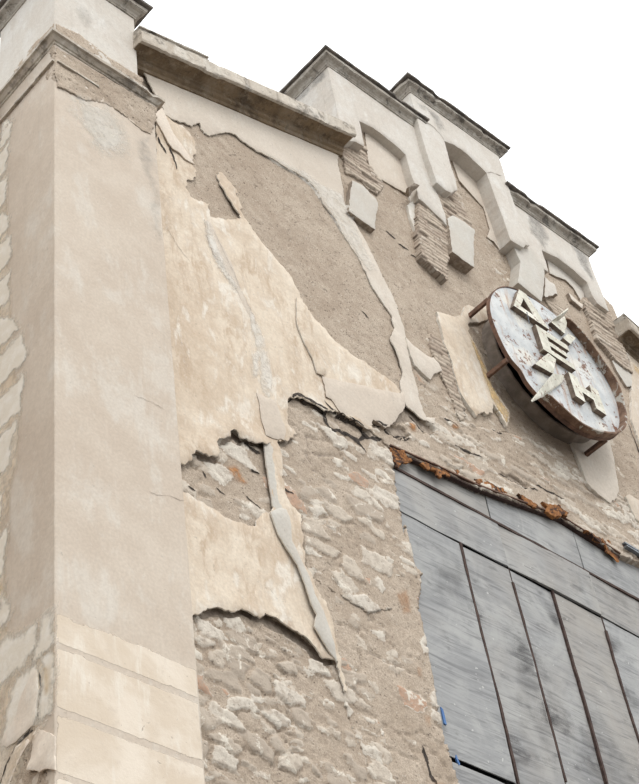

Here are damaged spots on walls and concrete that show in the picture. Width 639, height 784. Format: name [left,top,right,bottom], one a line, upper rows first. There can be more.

flaking render [56,24,143,85]
peeling [0,120,27,526]
flaking render [53,48,577,465]
flaking render [0,273,639,784]
rust [389,447,460,479]
rust [474,479,569,520]
rust [582,530,619,562]
crack [0,646,42,783]